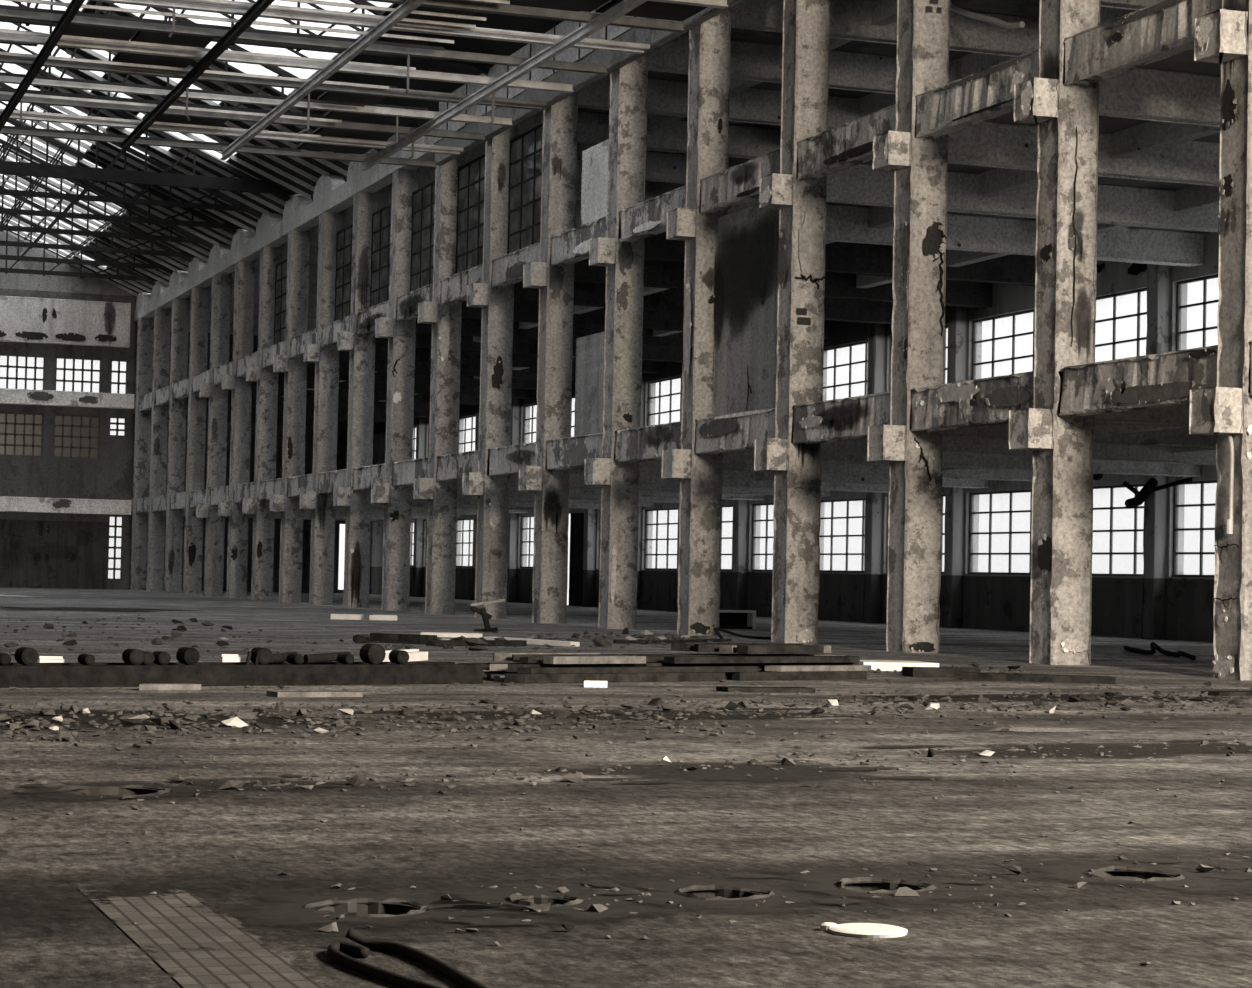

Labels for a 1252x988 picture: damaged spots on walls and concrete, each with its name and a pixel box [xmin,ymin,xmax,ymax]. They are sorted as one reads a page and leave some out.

spalling [900,219,947,308]
spalling [492,356,504,389]
peeling [799,415,823,430]
peeling [914,382,1031,423]
peeling [1105,378,1210,424]